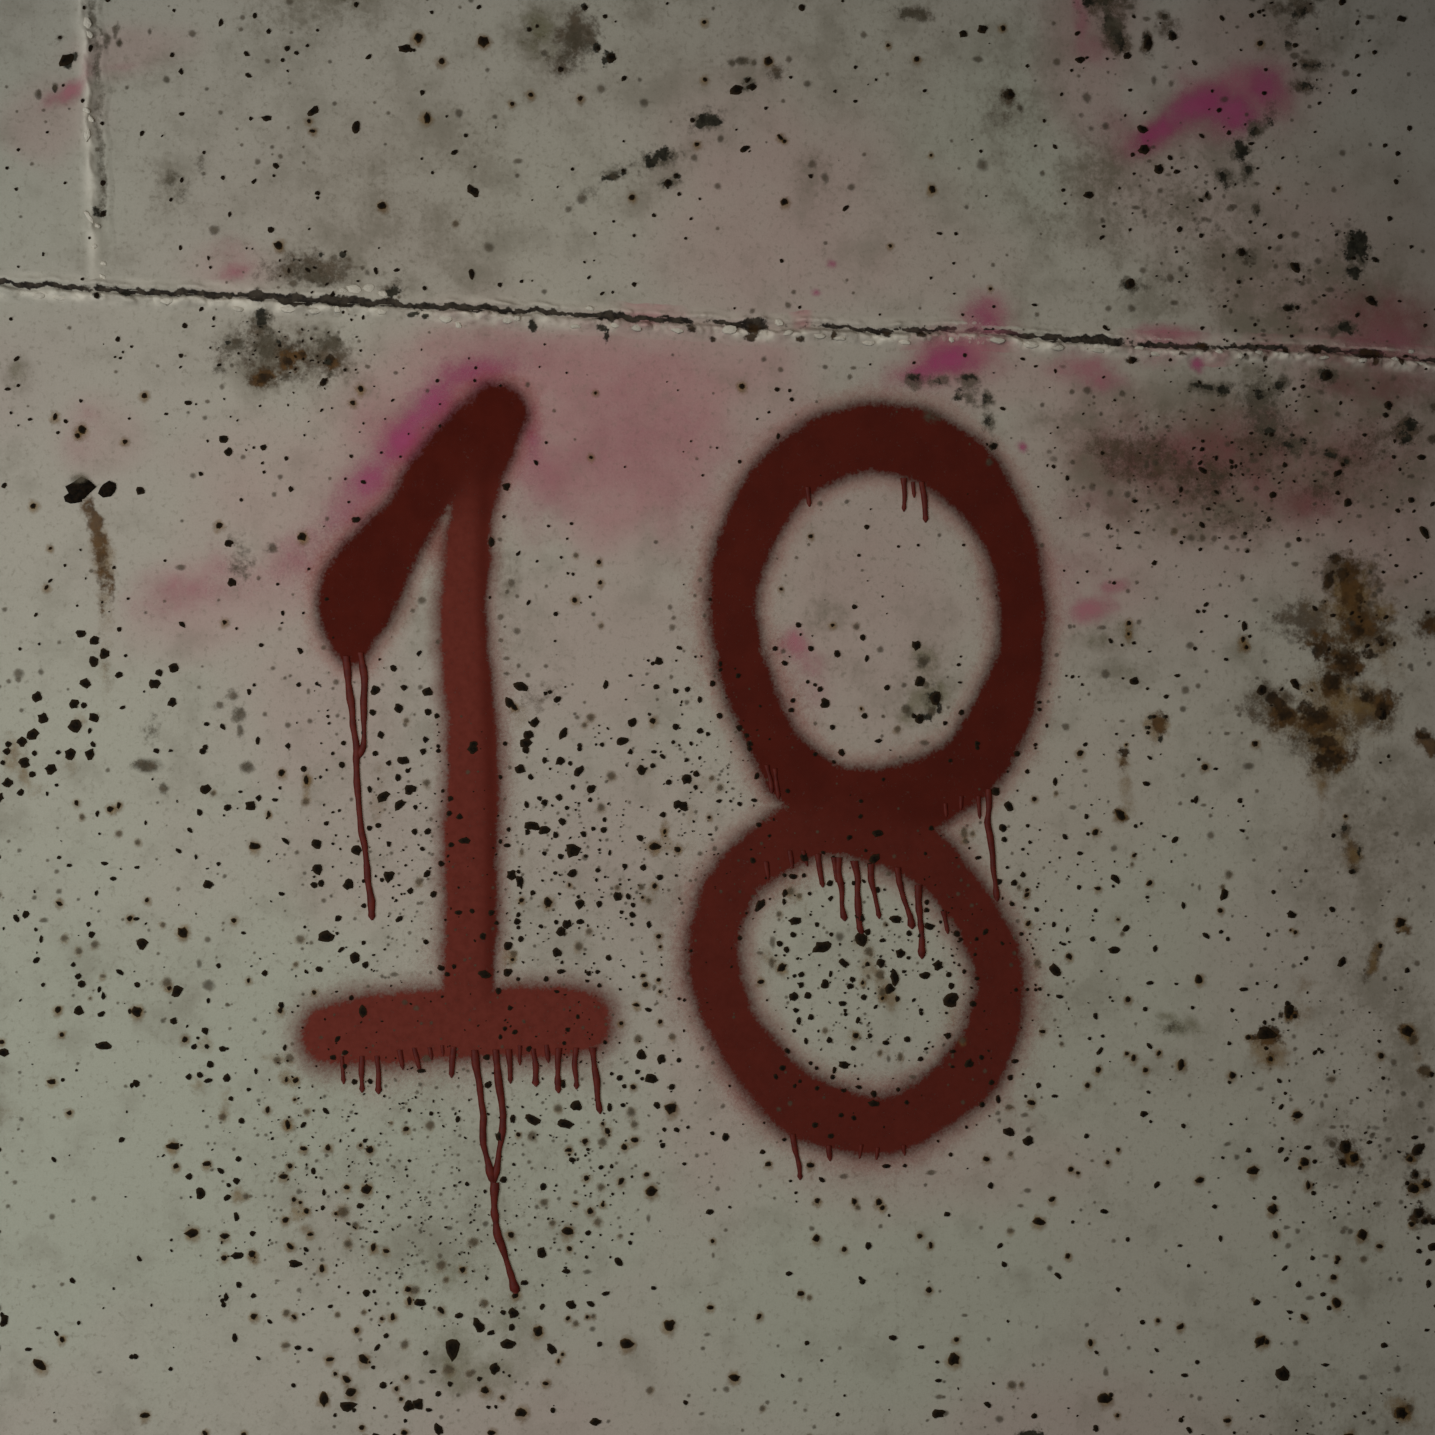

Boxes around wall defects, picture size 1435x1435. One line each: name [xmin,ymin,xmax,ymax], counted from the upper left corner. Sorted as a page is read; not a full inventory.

corrosion [218,13,319,84]
water stain [1083,0,1174,58]
water stain [1264,0,1313,47]
water stain [1294,59,1321,91]
water stain [1207,118,1273,199]
water stain [1344,230,1379,280]
corrosion [4,356,83,439]
corrosion [44,498,165,678]
corrosion [772,604,882,666]
corrosion [284,1344,351,1388]
corrosion [889,1335,1043,1430]
corrosion [1121,1318,1204,1435]